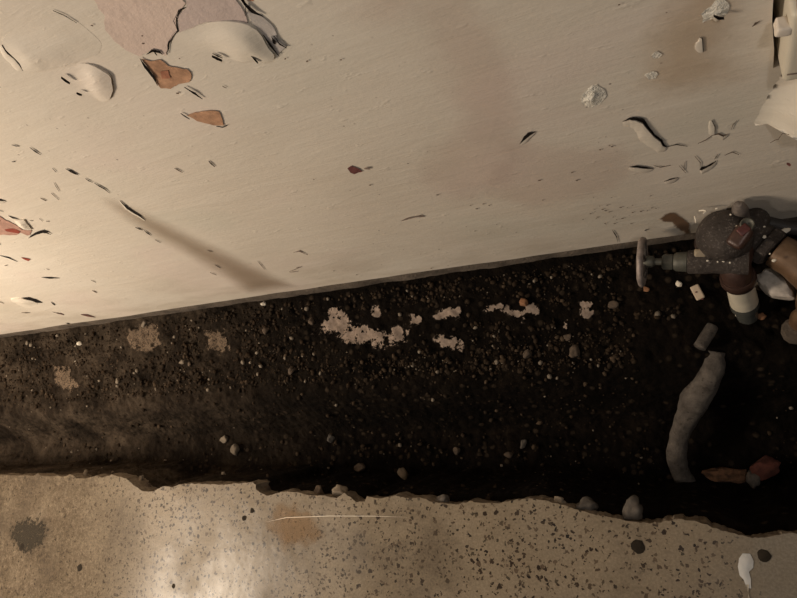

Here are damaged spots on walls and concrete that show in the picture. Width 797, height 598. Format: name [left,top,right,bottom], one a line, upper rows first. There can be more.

crack [0,45,23,71]
peeling [95,0,287,99]
peeling [182,111,227,128]
crack [623,117,739,184]
crack [0,145,161,243]
peeling [0,217,51,238]
water stain [10,517,49,554]